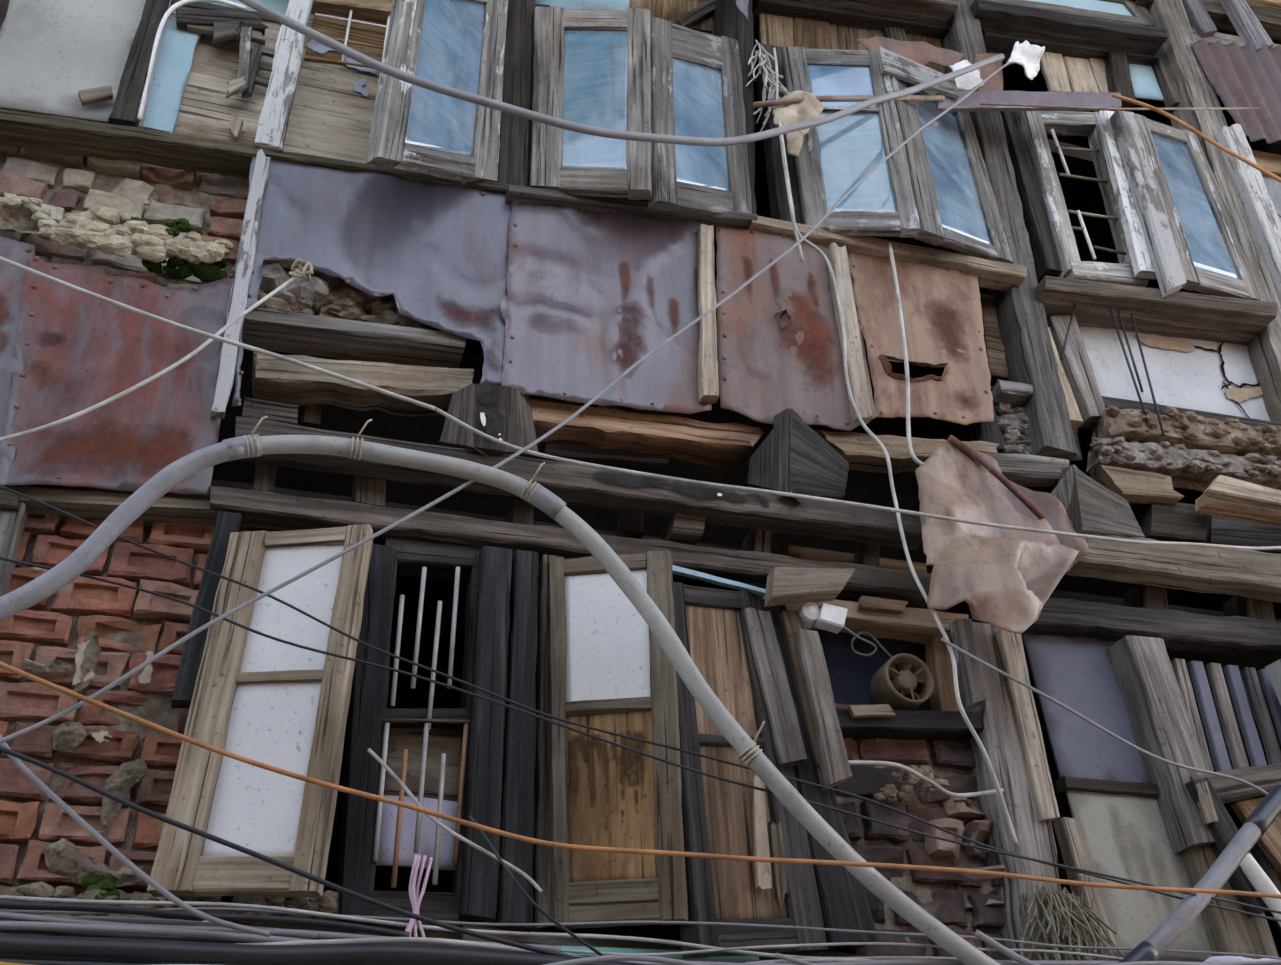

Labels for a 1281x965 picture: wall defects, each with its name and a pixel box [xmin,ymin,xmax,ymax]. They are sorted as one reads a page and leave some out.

spalling [0,193,234,264]
corrosion [744,259,752,288]
corrosion [616,263,641,368]
corrosion [670,299,679,328]
corrosion [771,261,833,383]
corrosion [934,306,964,355]
crack [1194,342,1260,418]
corrosion [43,427,187,472]